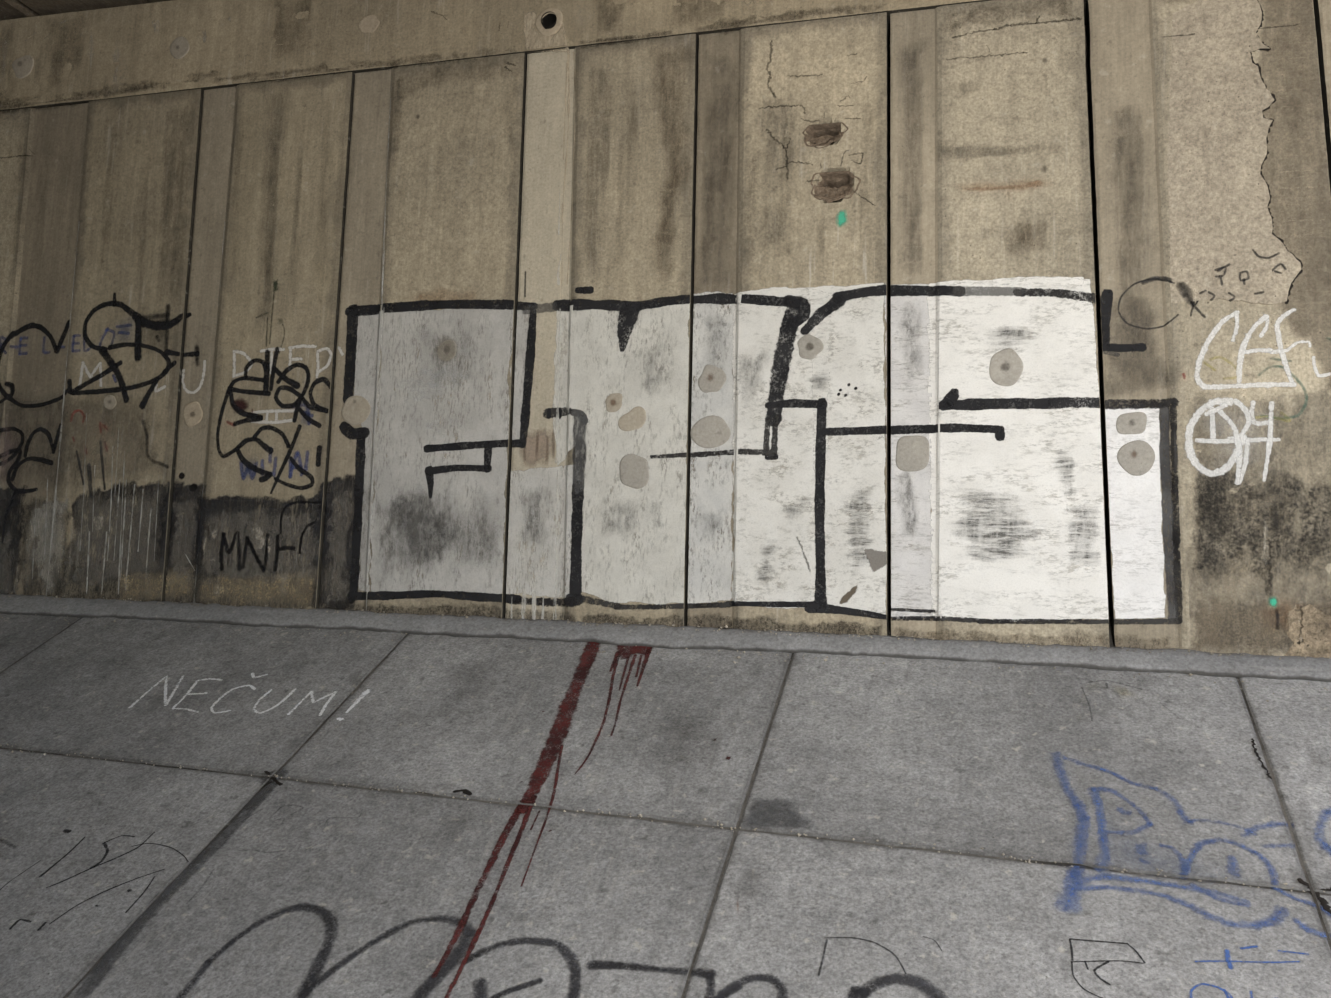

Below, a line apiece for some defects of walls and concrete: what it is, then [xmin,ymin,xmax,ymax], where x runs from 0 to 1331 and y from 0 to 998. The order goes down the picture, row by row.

crack [766,51,821,176]
spalling [802,117,857,149]
spalling [807,154,873,205]
peeling [1167,0,1303,305]
leakage [17,463,313,604]
leakage [1197,474,1331,590]